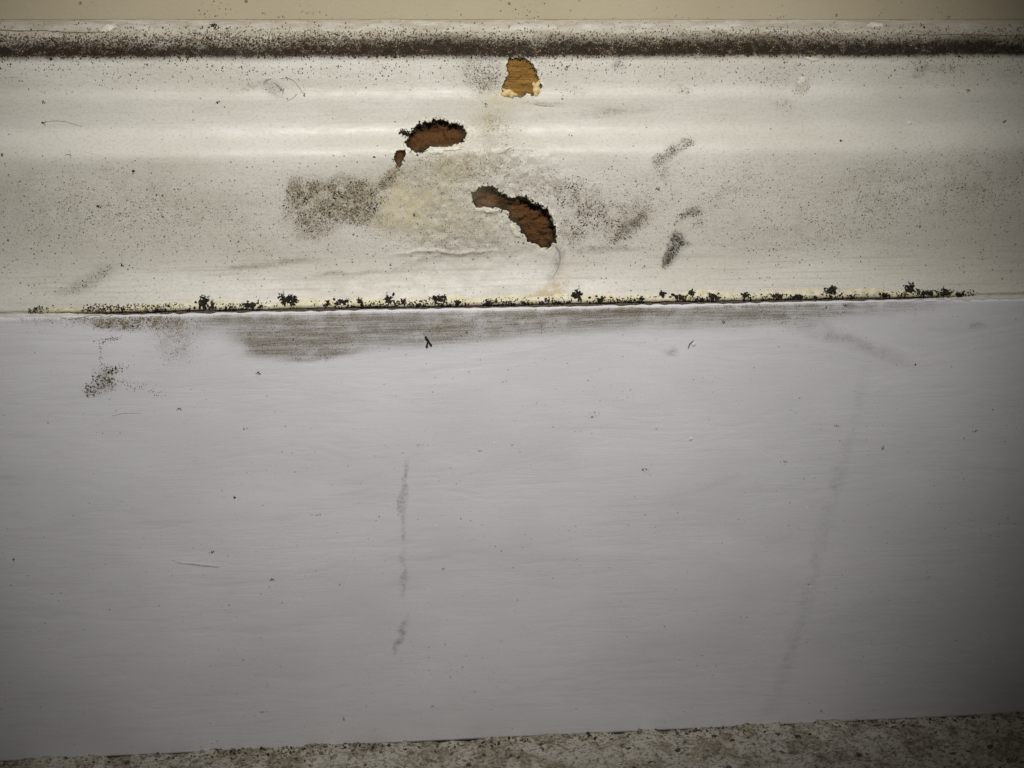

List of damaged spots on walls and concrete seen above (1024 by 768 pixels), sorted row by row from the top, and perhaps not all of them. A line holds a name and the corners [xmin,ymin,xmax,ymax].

peeling [500,55,545,100]
spalling [394,119,467,167]
water stain [1,49,1020,297]
spalling [471,186,556,248]
water stain [51,302,876,397]